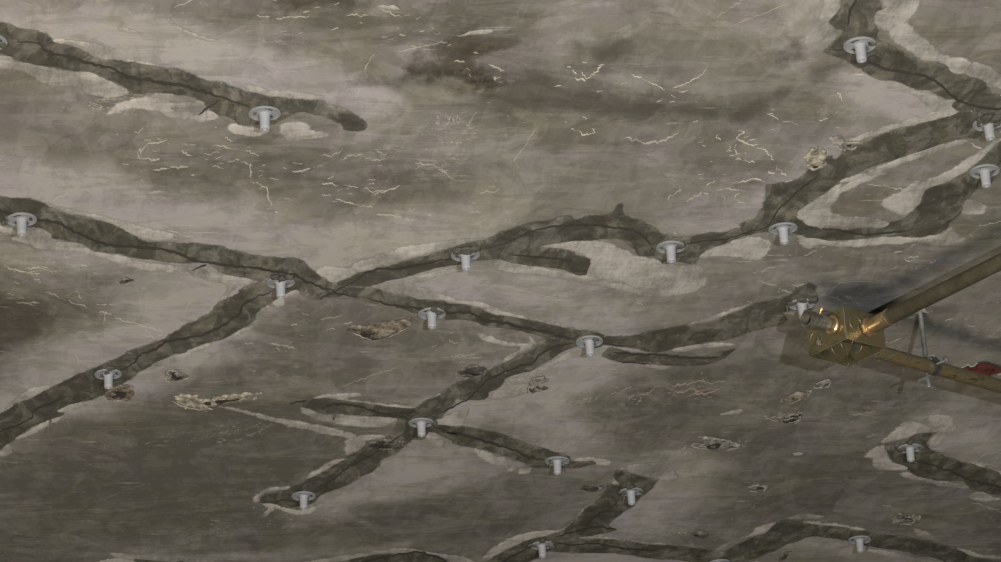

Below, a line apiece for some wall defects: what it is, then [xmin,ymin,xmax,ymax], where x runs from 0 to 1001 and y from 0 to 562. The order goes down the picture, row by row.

crack [0,23,367,141]
leakage [408,29,517,92]
crack [338,0,1001,297]
spalling [803,136,860,171]
spalling [104,384,136,402]
spalling [164,369,191,382]
spalling [172,392,263,412]
spalling [347,317,413,340]
crack [0,196,817,471]
crack [220,406,404,516]
crack [864,414,1001,502]
crack [482,463,1001,562]